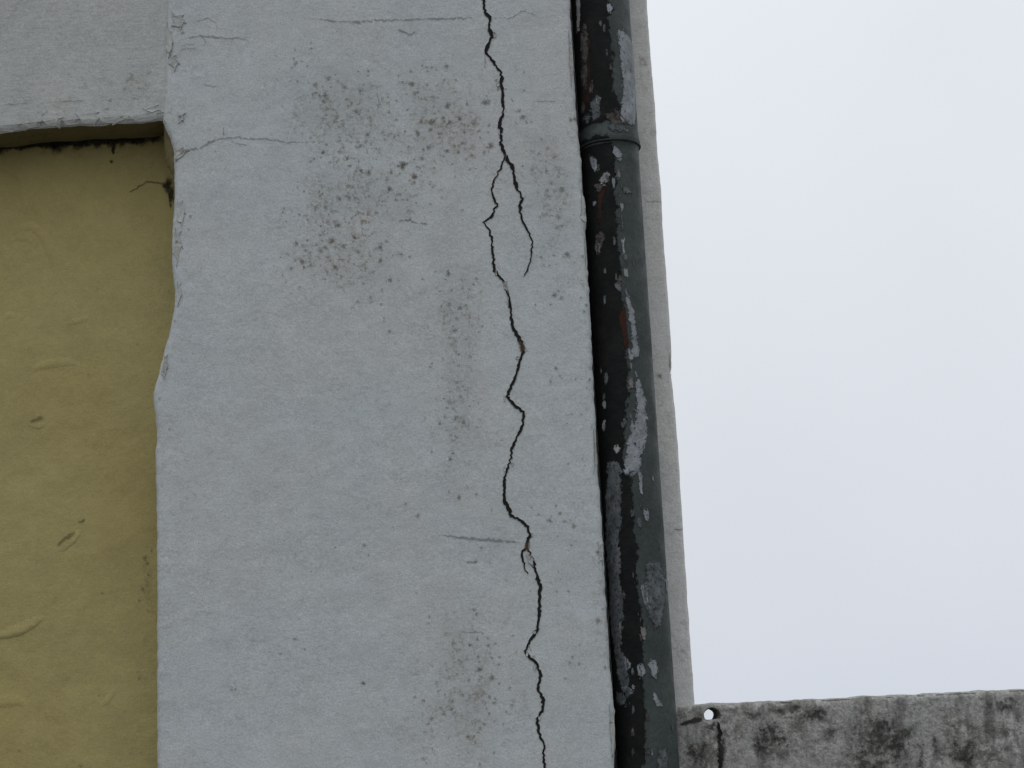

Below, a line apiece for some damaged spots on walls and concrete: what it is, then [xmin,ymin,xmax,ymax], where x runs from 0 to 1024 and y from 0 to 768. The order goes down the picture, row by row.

water stain [0,137,160,154]
crack [482,0,547,768]
peeling [569,0,668,768]
water stain [747,706,837,754]
water stain [857,715,938,768]